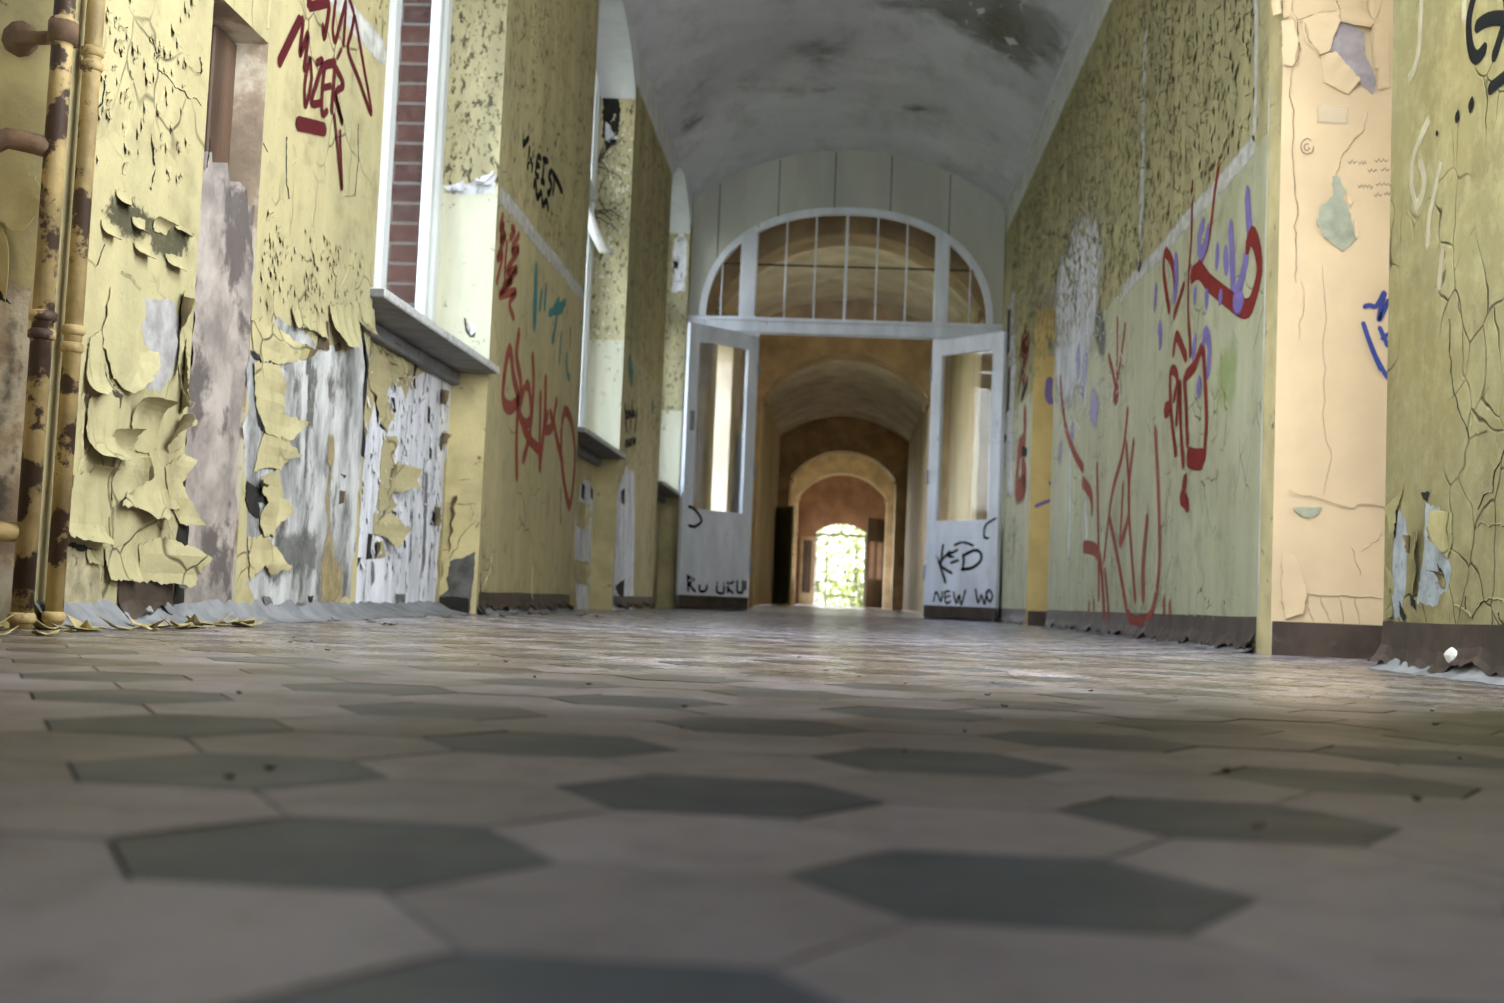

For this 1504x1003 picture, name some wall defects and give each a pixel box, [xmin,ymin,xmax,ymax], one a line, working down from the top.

peeling [98,0,196,272]
crack [98,18,211,191]
leakage [922,0,1056,64]
crack [88,244,141,291]
peeling [1002,0,1390,584]
peeling [64,287,212,605]
peeling [243,210,475,613]
crack [1449,319,1504,528]
spalling [1384,485,1452,621]
crack [1454,596,1504,625]